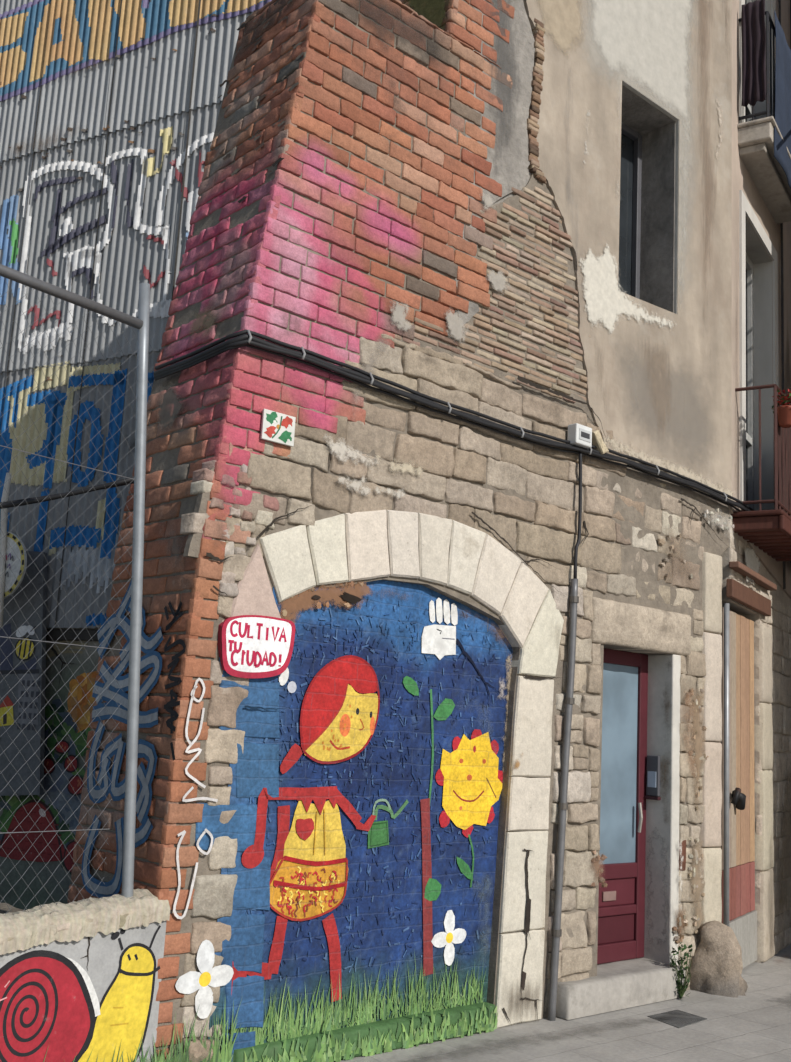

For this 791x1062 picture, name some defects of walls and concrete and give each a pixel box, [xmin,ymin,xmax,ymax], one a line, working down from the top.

flaking render [393,18,596,403]
crack [524,849,532,898]
crack [503,932,539,1026]